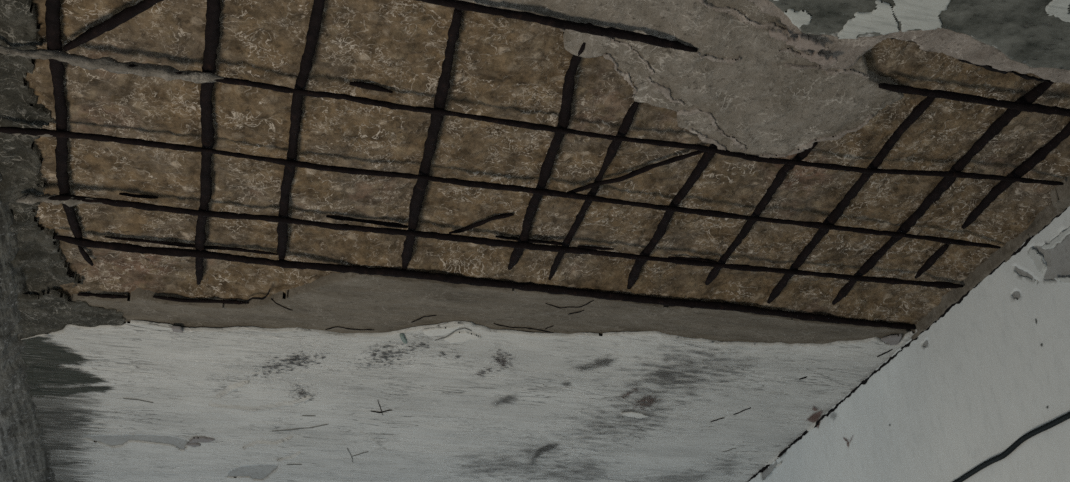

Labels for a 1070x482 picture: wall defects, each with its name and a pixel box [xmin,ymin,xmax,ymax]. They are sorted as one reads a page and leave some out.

spalling [0,0,1070,347]